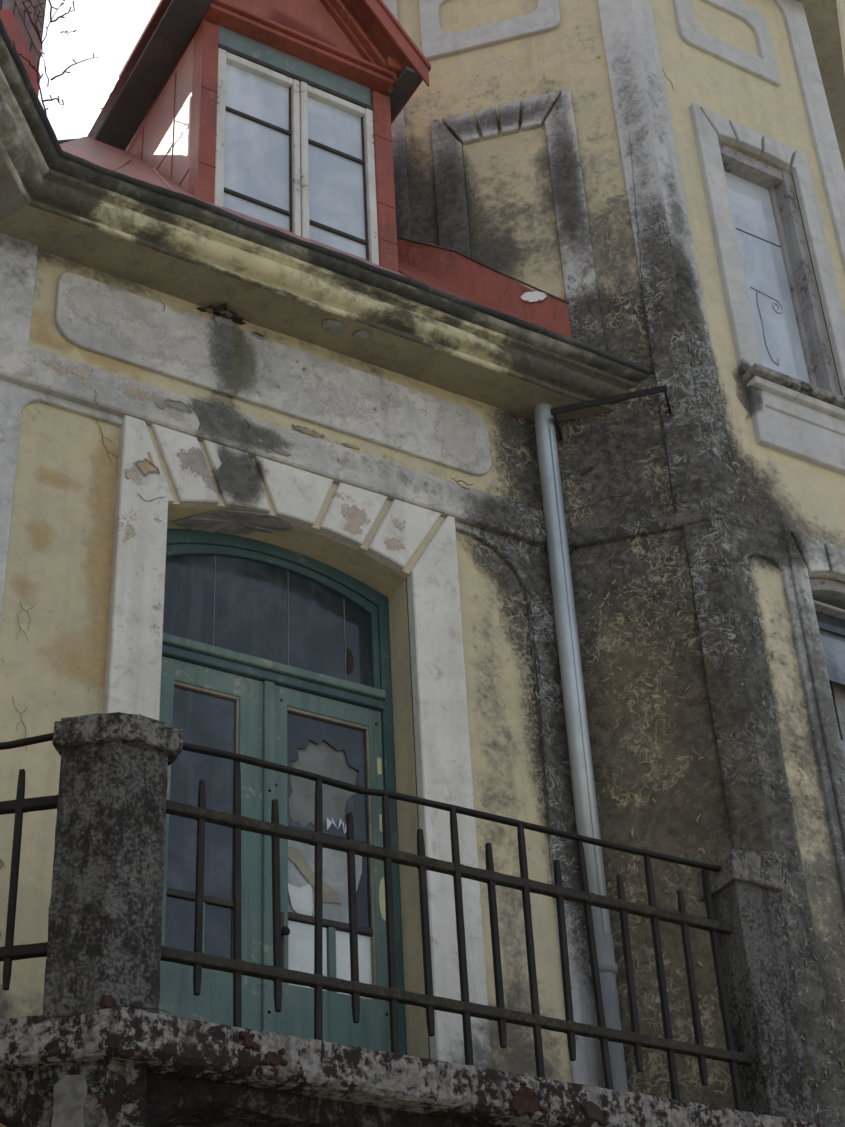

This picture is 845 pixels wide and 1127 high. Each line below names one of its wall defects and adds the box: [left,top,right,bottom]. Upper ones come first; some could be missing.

water stain [393,98,561,275]
water stain [553,122,582,236]
peeling [125,451,160,486]
water stain [66,285,287,504]
peeling [333,491,370,535]
water stain [460,409,590,978]
water stain [554,197,845,1127]